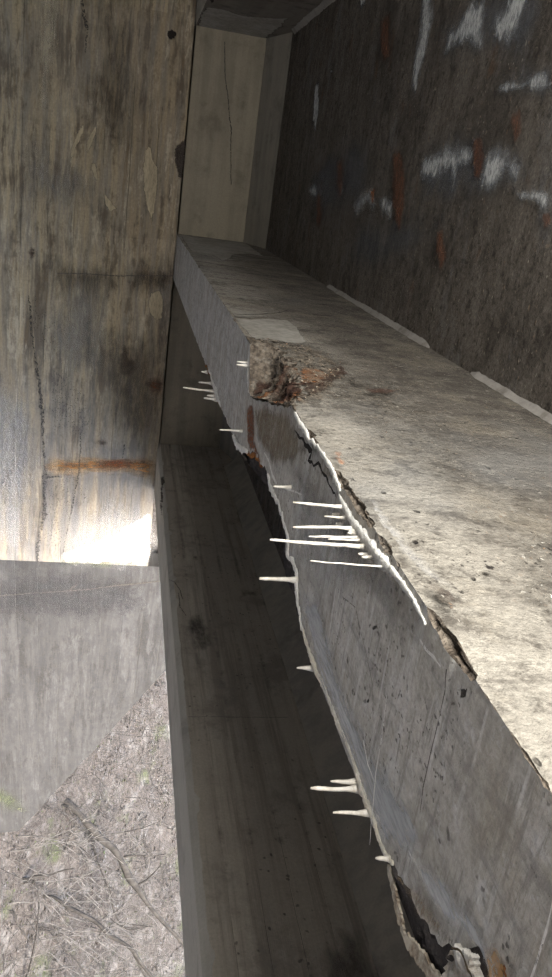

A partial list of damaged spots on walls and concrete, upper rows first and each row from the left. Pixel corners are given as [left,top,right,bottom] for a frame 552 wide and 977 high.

crack [224,42,232,185]
spalling [228,307,347,411]
crack [28,295,81,565]
rust [53,460,153,472]
rust [247,405,260,462]
crack [295,431,336,497]
spalling [386,862,489,977]